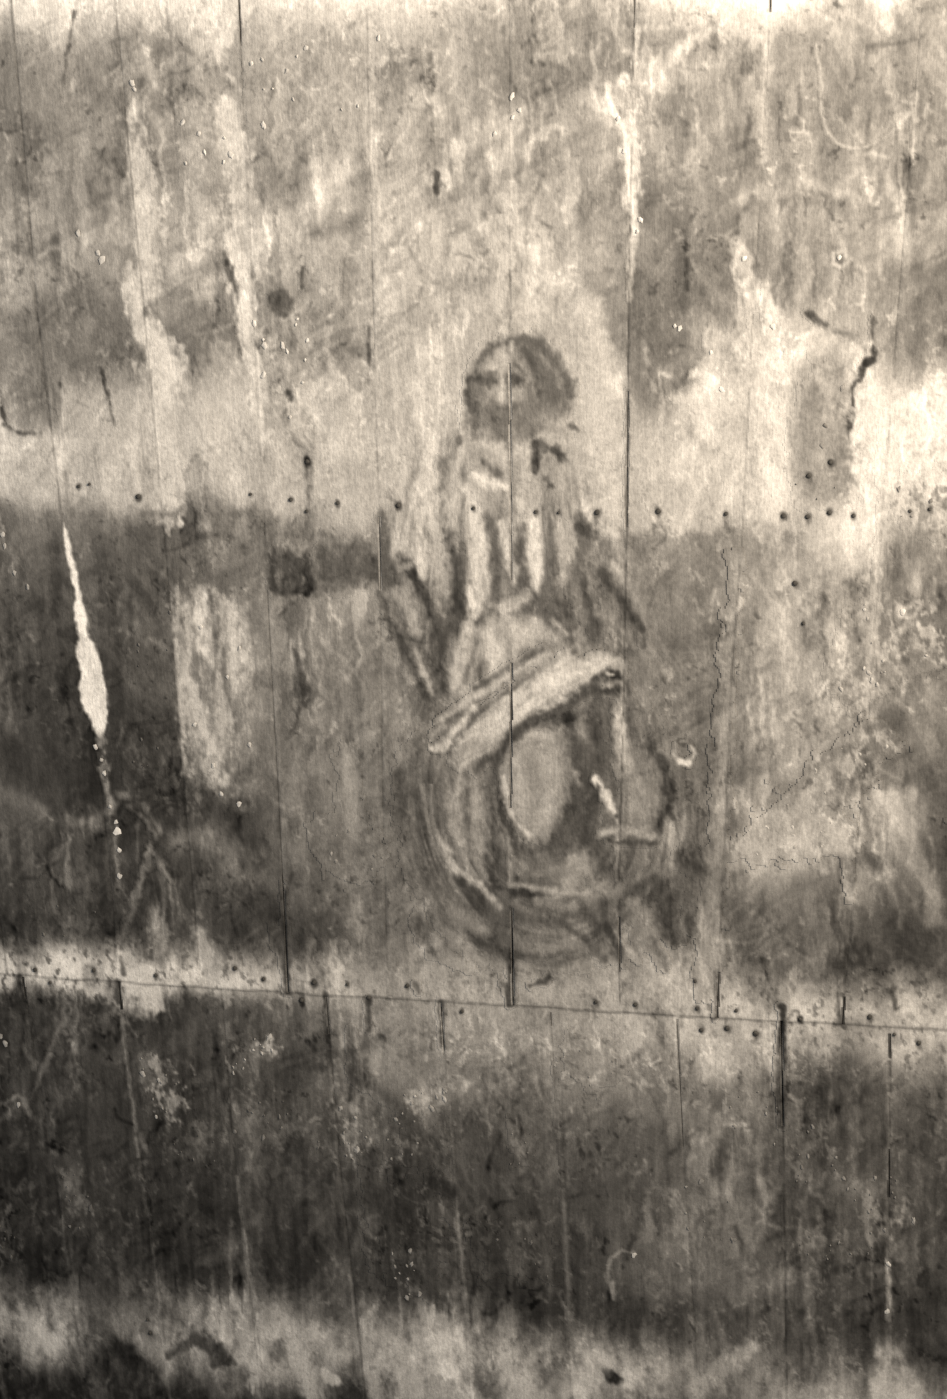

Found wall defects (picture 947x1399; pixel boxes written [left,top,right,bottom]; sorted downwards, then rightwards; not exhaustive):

damp [0,0,565,202]
damp [620,0,945,170]
crack [0,364,49,440]
damp [0,80,947,608]
crack [758,282,880,433]
peeling [22,521,266,945]
damp [0,547,947,1399]